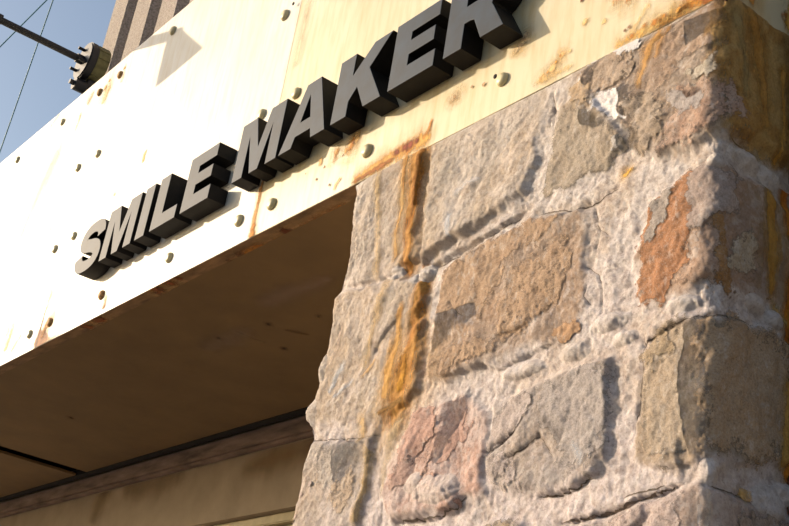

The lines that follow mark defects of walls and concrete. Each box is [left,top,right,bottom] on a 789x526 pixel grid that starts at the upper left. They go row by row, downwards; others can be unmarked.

peeling [543,0,748,198]
rust [616,0,789,170]
rust [33,269,61,349]
rust [226,180,263,261]
rust [353,119,432,277]
rust [377,281,430,440]
rust [764,186,789,345]
rust [352,417,371,521]